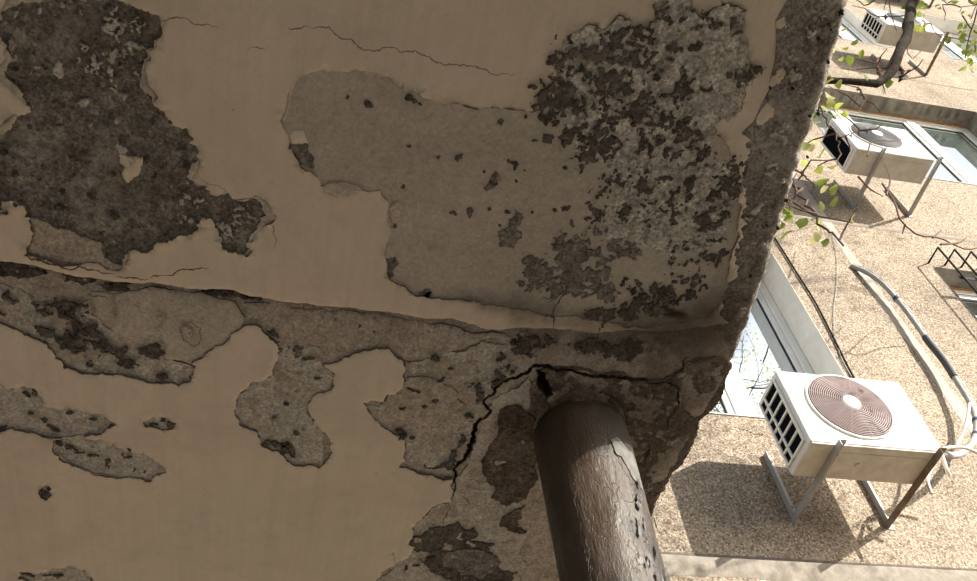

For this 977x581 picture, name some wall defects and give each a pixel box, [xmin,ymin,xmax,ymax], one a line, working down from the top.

peeling [800,0,844,42]
peeling [769,50,808,111]
crack [26,255,207,281]
flaking render [0,0,780,581]
crack [548,283,567,328]
crack [432,358,685,524]